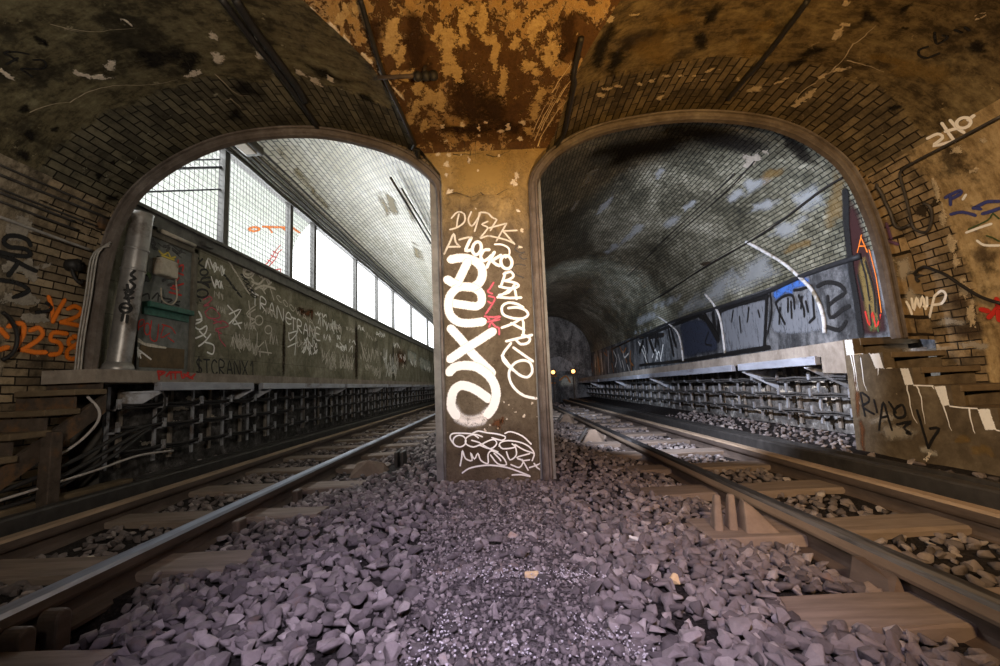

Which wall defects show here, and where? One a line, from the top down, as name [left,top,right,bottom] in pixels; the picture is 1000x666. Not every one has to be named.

peeling [327,0,361,43]
flaking render [208,32,225,64]
flaking render [73,60,116,80]
flaking render [296,69,334,88]
peeling [361,2,561,176]
water stain [440,80,520,134]
water stain [532,16,576,147]
water stain [729,180,760,201]
peeling [5,215,34,244]
peeling [914,178,977,328]
peeling [0,258,51,324]
water stain [708,259,770,298]